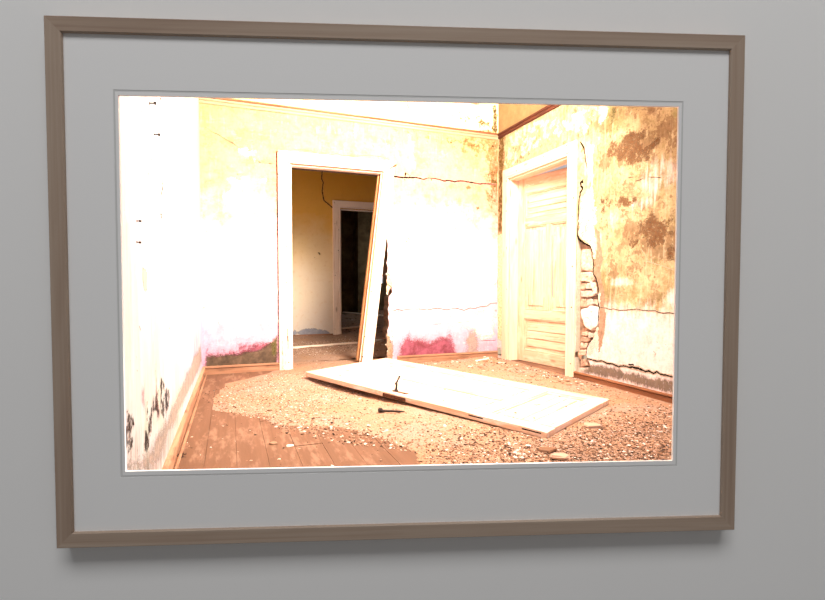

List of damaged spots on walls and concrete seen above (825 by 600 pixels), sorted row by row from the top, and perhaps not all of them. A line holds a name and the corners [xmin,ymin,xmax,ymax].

leakage [606,130,660,165]
leakage [601,196,637,213]
crack [211,131,497,336]
flaking render [504,106,609,372]
leakage [628,211,675,260]
peeling [398,234,502,341]
leakage [399,335,455,356]
leakage [466,331,479,352]
crack [586,357,673,378]
leakage [128,328,330,470]